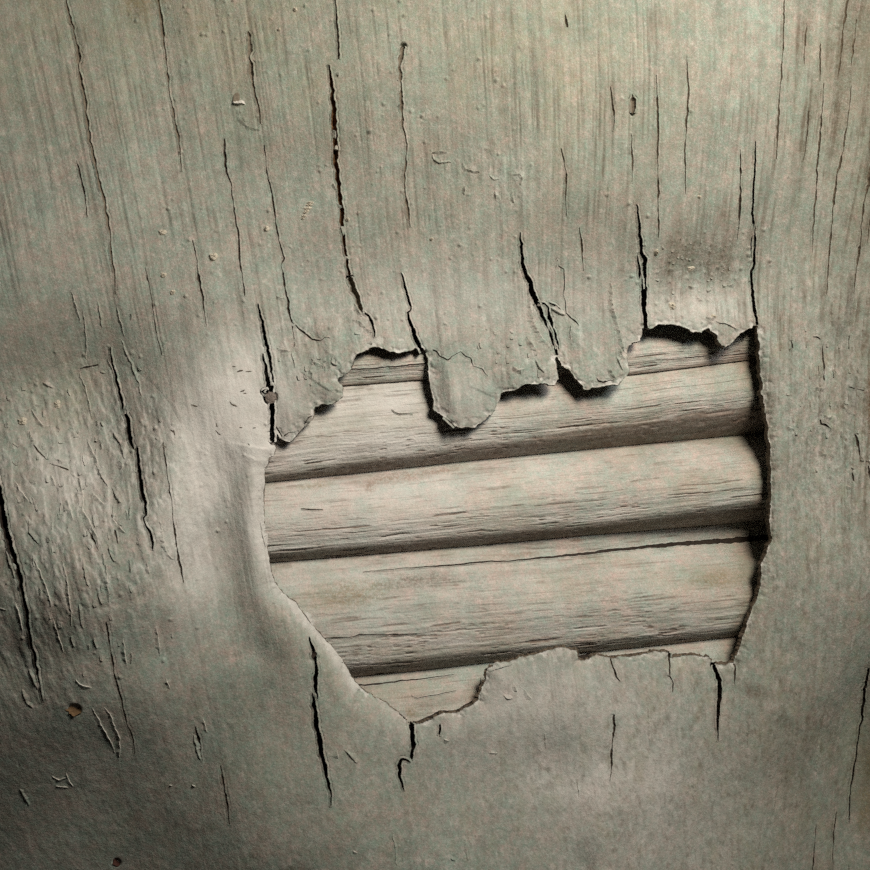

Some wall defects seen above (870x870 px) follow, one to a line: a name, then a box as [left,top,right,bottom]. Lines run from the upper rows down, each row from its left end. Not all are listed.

crack [215,138,313,446]
crack [245,31,331,343]
crack [326,0,377,338]
crack [517,147,586,355]
crack [608,74,662,330]
crack [0,476,46,702]
crack [75,347,186,584]
crack [307,632,417,807]
crack [358,674,481,792]
spalling [258,282,772,724]
crack [710,663,738,742]
crack [811,654,870,870]